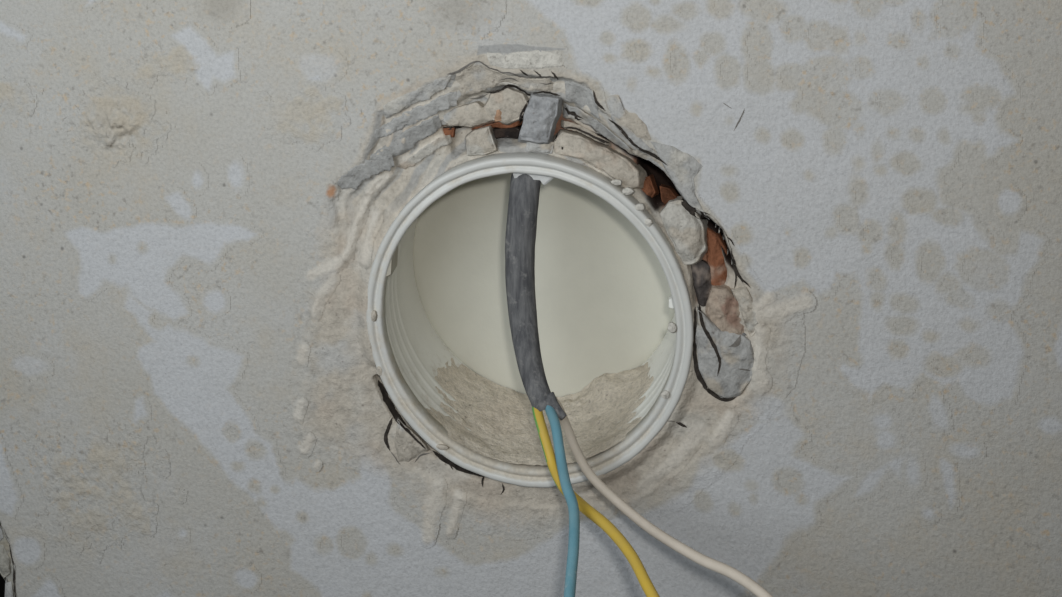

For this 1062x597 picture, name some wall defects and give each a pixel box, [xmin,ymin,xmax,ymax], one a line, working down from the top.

flaking render [282,46,805,541]
flaking render [0,526,15,597]